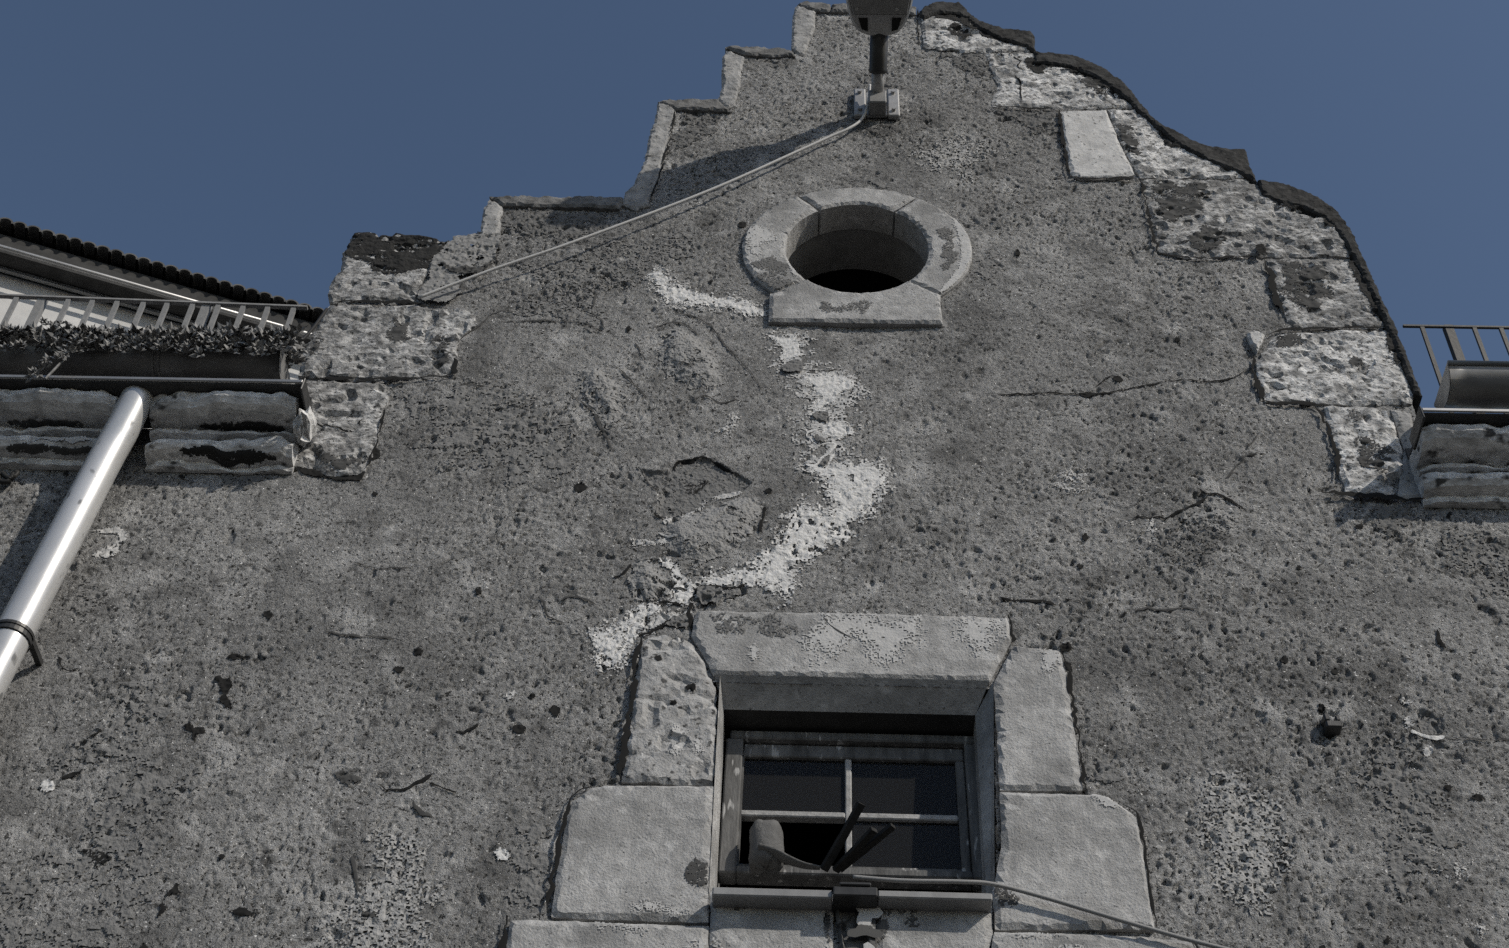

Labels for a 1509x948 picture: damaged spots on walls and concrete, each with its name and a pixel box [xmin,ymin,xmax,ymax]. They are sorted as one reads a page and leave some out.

spalling [1188,225,1227,251]
spalling [417,232,501,302]
water stain [750,254,794,290]
crack [975,52,1452,519]
water stain [820,299,873,314]
spalling [299,448,381,481]
peeling [573,265,897,683]
peeling [1048,464,1088,495]
water stain [710,612,799,637]